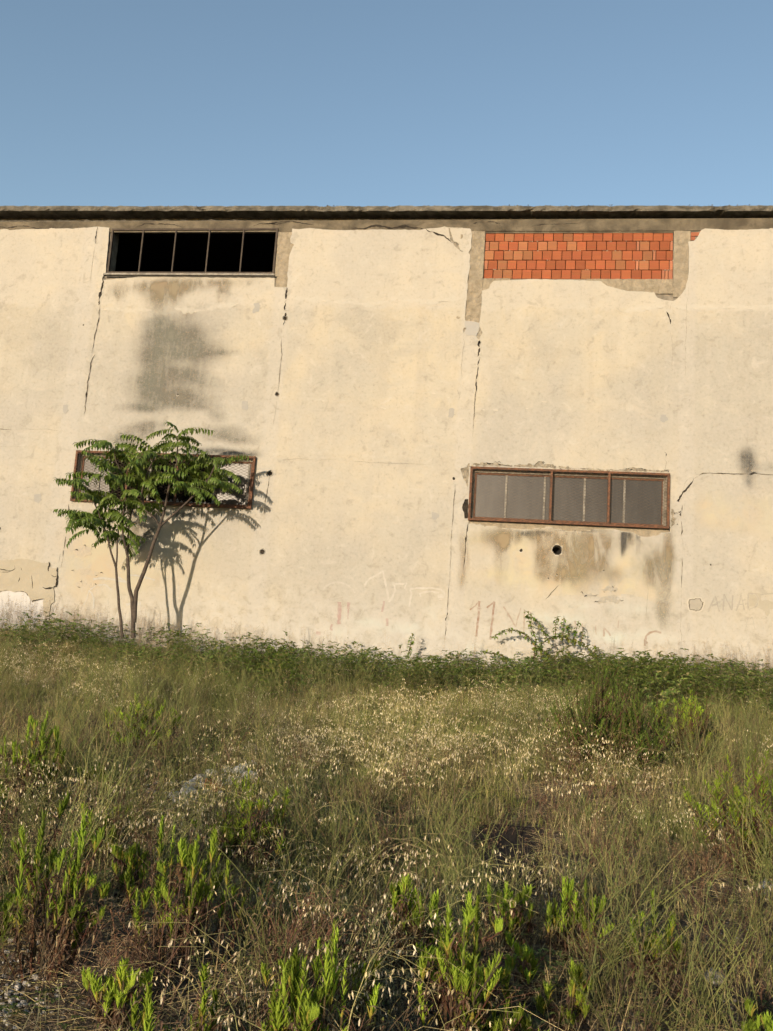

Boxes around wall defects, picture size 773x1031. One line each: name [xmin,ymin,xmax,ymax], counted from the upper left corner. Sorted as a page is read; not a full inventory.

crack [3,225,104,413]
damp [141,280,226,302]
spalling [448,222,539,339]
spalling [587,231,699,297]
crack [458,339,481,426]
crack [630,454,770,593]
peeling [0,559,58,629]
damp [313,523,699,664]